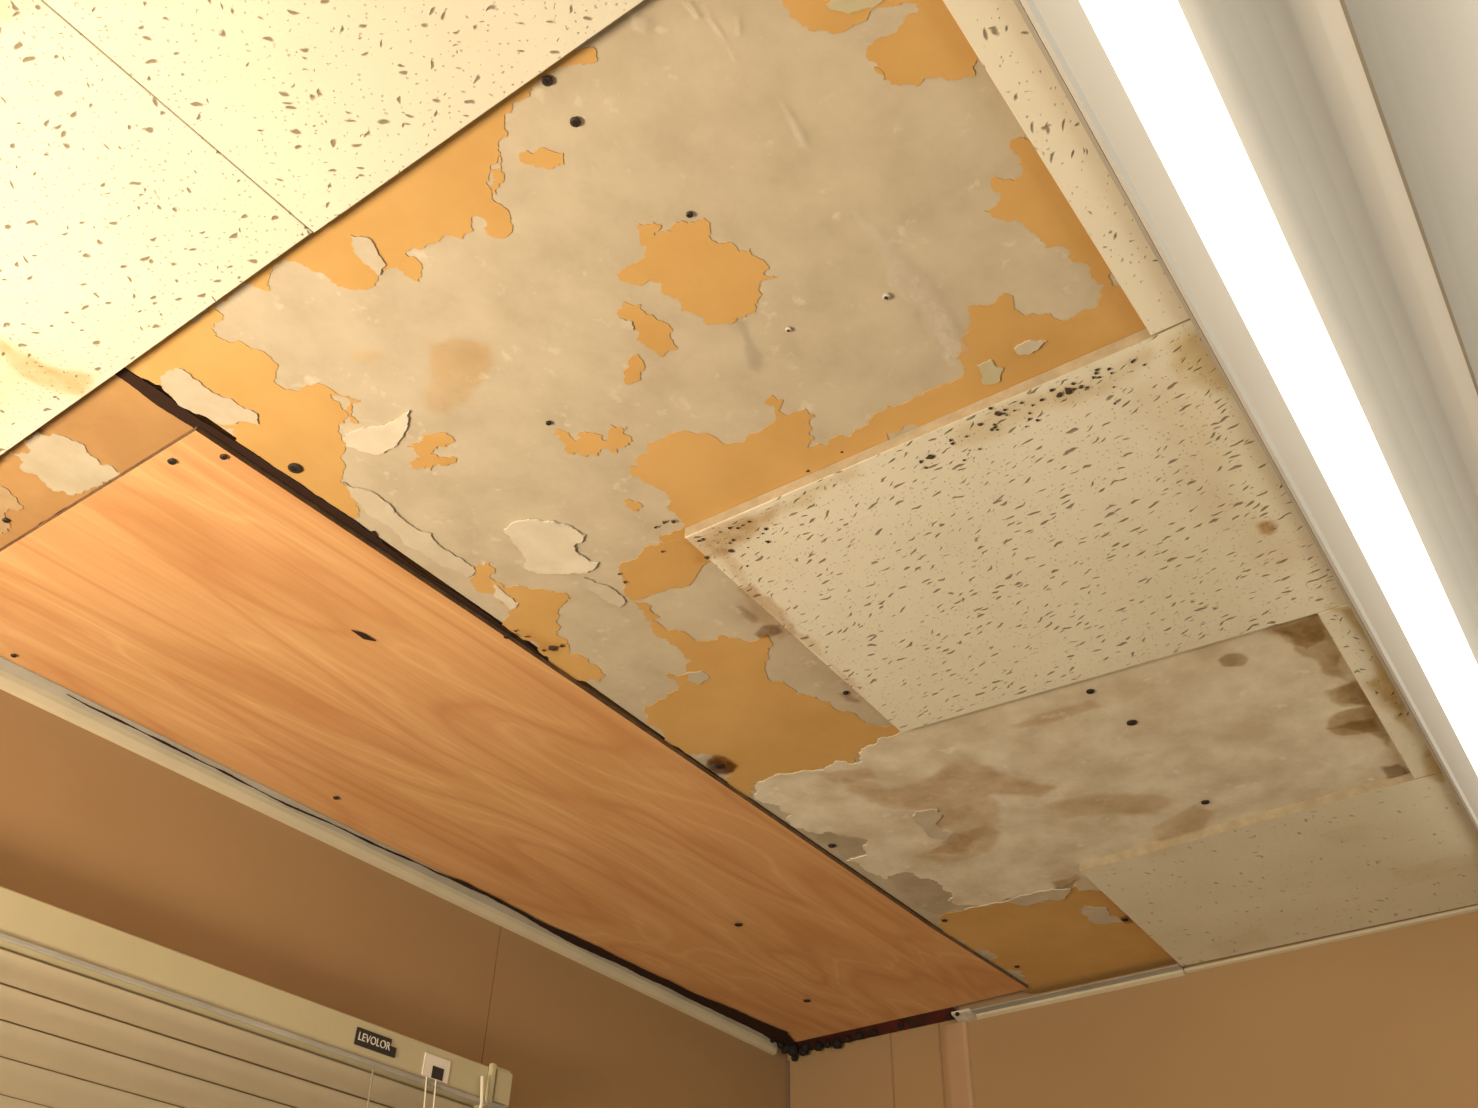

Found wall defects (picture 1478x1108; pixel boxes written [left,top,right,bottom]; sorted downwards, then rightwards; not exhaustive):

peeling [782,0,979,87]
leakage [949,367,1116,461]
peeling [10,431,121,496]
peeling [0,486,24,534]
leakage [697,521,769,567]
peeling [125,47,1410,994]